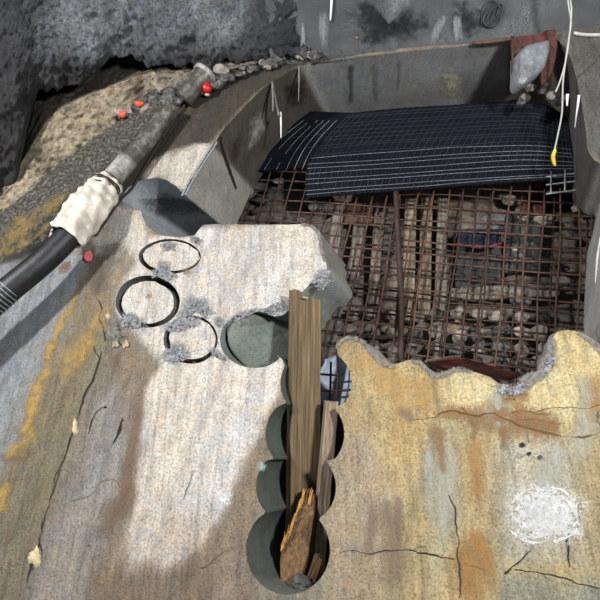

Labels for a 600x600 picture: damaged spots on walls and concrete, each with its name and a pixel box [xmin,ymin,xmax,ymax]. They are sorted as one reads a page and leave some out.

spalling [239,169,600,401]
crack [22,298,123,600]
corrosion [431,428,445,470]
corrosion [443,390,559,495]
crack [412,407,591,443]
crack [335,495,483,598]
crack [505,524,599,589]